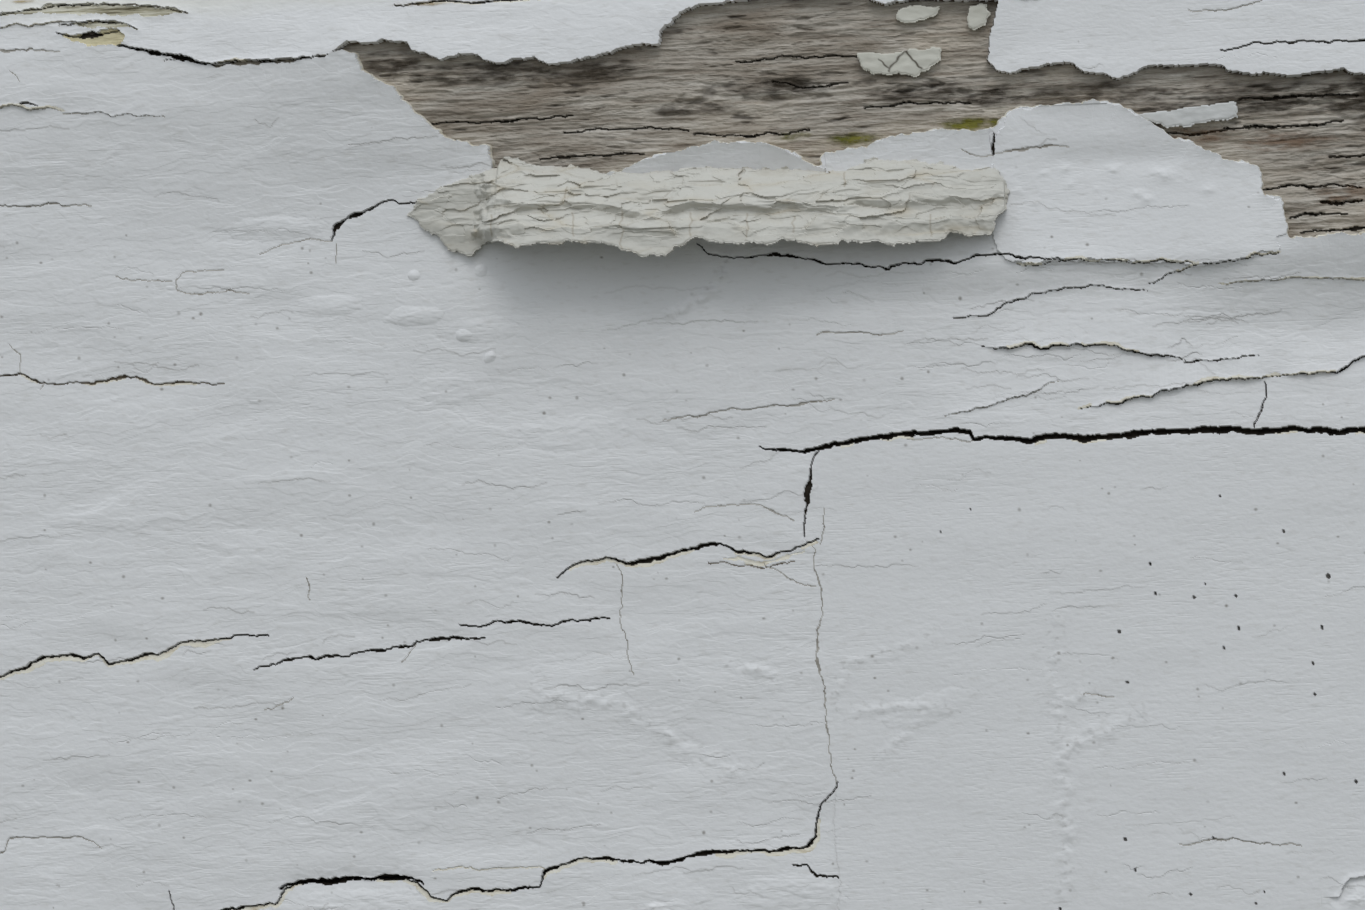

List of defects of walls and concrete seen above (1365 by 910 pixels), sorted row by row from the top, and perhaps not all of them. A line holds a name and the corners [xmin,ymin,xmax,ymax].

peeling [0,0,1365,319]
crack [259,200,415,264]
crack [0,344,225,390]
peeling [982,341,1365,410]
crack [0,382,1365,910]